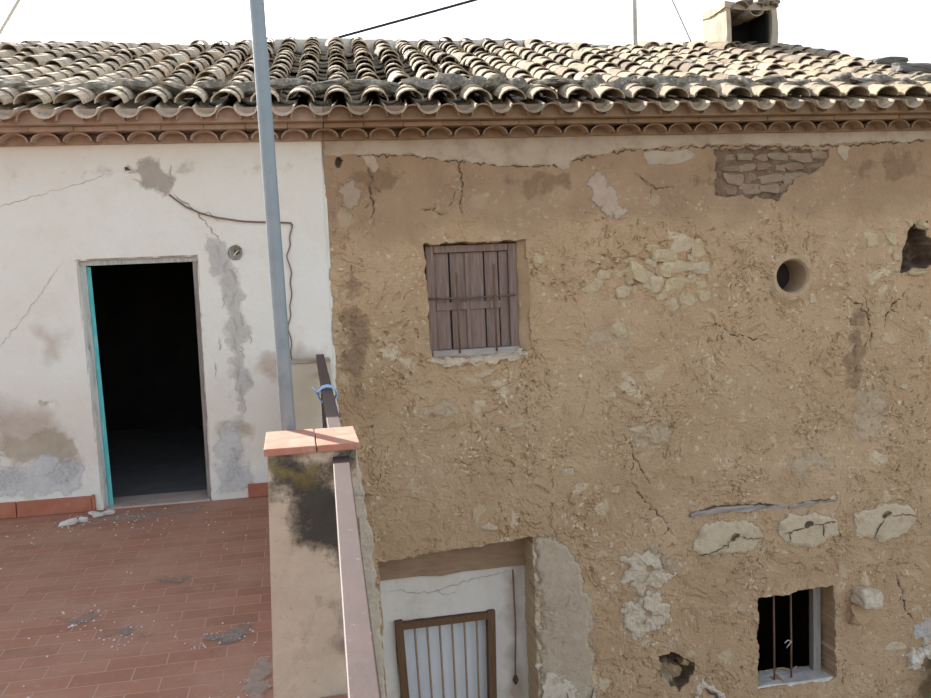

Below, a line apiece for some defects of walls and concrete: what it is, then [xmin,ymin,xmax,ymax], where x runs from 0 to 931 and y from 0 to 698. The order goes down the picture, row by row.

crack [366,168,380,218]
crack [424,162,464,215]
flaking render [322,130,931,201]
spalling [884,219,931,276]
crack [0,166,253,414]
water stain [0,430,84,497]
crack [397,570,510,595]
hole [659,652,695,692]